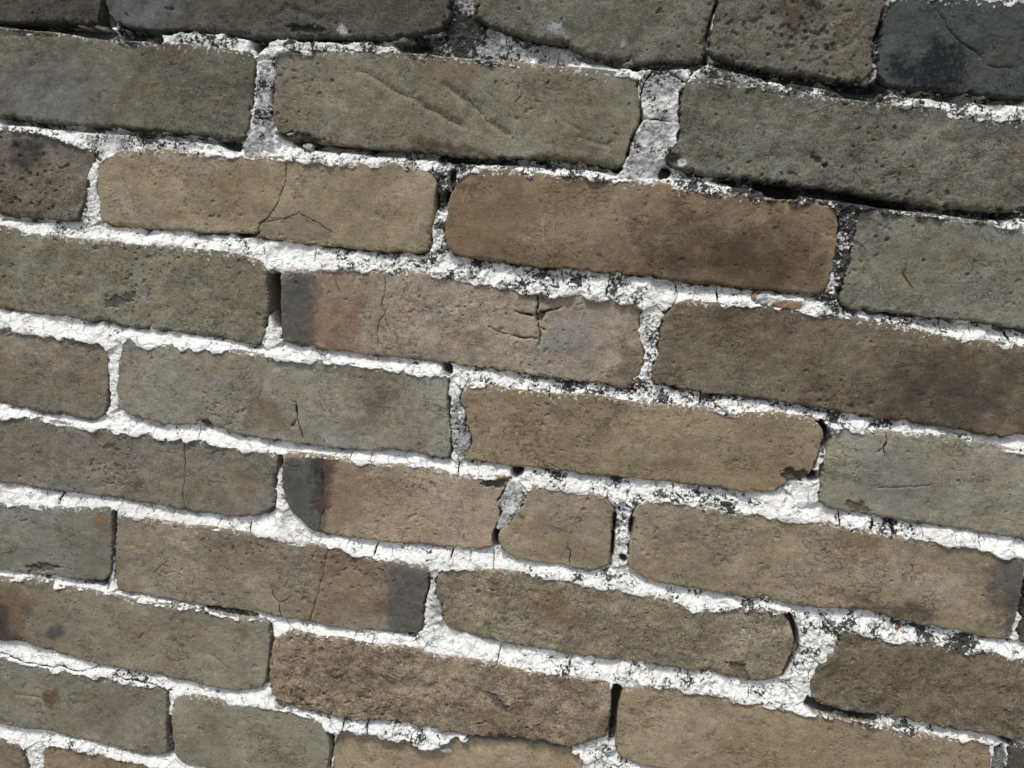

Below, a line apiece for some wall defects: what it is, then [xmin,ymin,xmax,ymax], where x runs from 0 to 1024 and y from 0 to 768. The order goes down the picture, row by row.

crack [258,161,338,288]
crack [491,295,561,344]
crack [272,538,351,634]